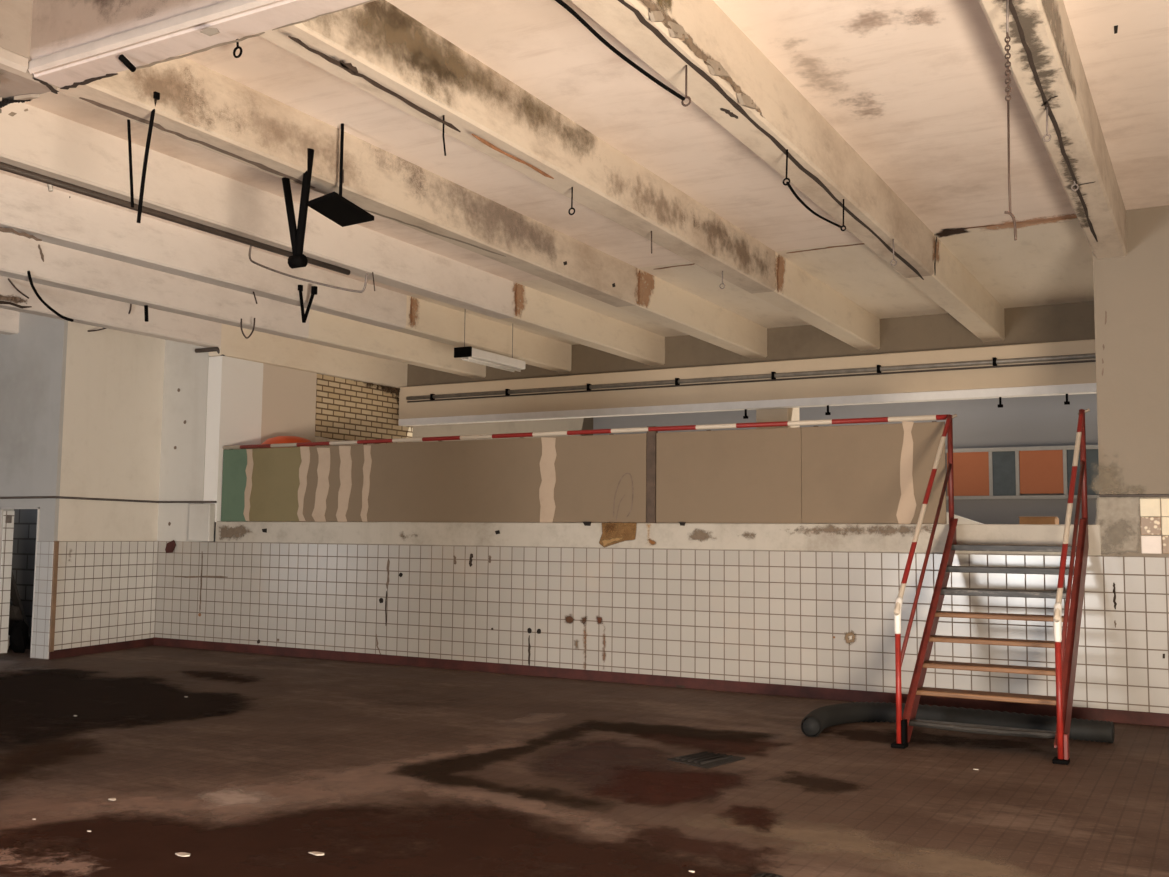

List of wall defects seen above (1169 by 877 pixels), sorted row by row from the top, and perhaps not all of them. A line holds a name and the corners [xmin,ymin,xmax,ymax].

water stain [351,1,589,146]
water stain [996,0,1076,110]
crack [935,0,1098,242]
water stain [457,184,550,252]
water stain [694,222,767,271]
water stain [1056,137,1089,228]
spalling [583,522,637,547]
water stain [0,669,256,779]
water stain [203,790,274,806]
water stain [533,732,784,806]